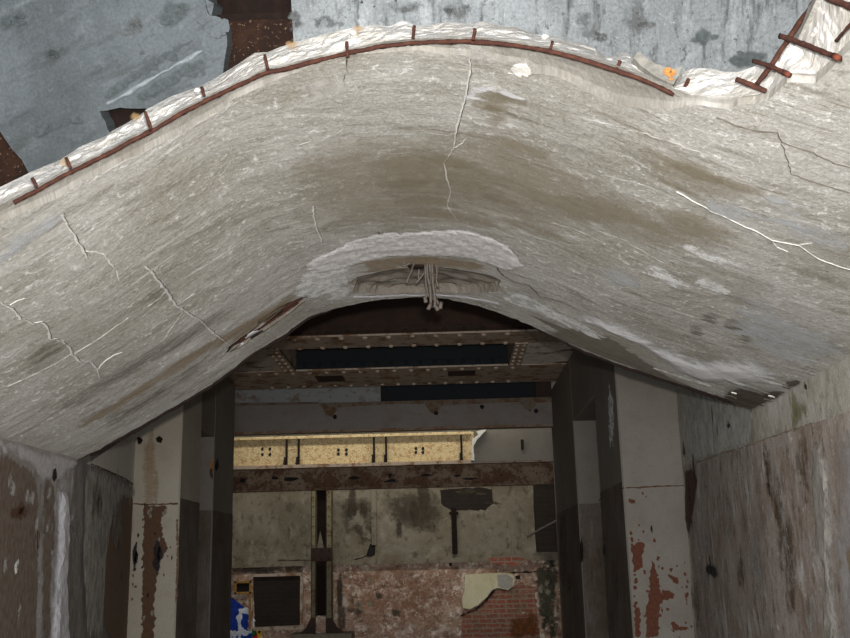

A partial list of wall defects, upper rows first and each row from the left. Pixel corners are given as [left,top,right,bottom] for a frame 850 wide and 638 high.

spalling [0,0,850,222]
crack [443,58,472,218]
crack [716,117,850,193]
crack [0,298,128,387]
crack [61,213,119,281]
crack [144,265,231,346]
spalling [215,296,308,362]
spalling [348,267,503,306]
crack [676,191,850,271]
flaking render [461,582,540,638]